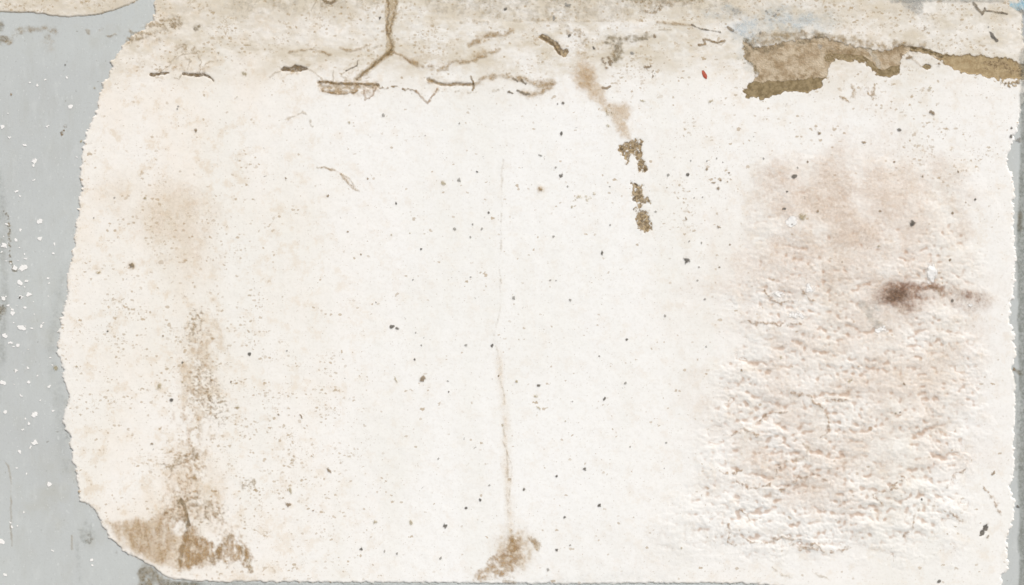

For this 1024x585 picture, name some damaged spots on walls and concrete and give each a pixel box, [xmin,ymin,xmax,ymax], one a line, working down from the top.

crack [301,0,410,80]
flaking render [742,30,1024,100]
peeling [1,223,44,331]
leakage [179,498,249,568]